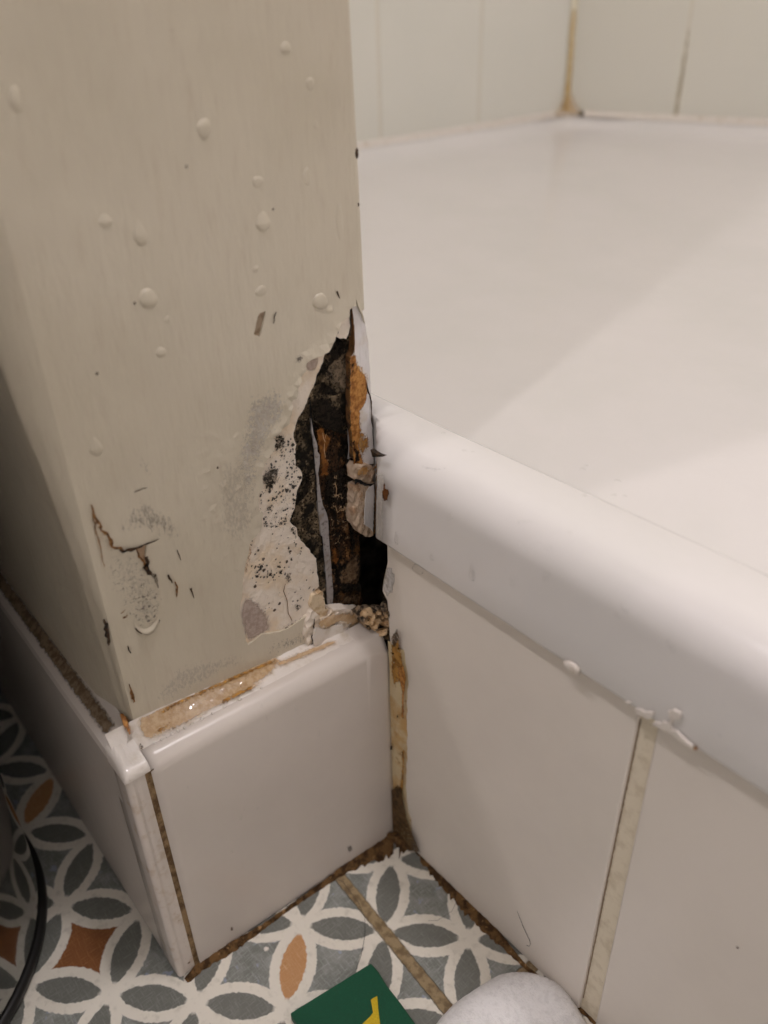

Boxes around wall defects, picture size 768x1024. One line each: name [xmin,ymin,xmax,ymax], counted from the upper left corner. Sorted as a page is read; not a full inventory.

spalling [240,309,394,647]
water stain [391,640,406,718]
water stain [392,750,406,830]